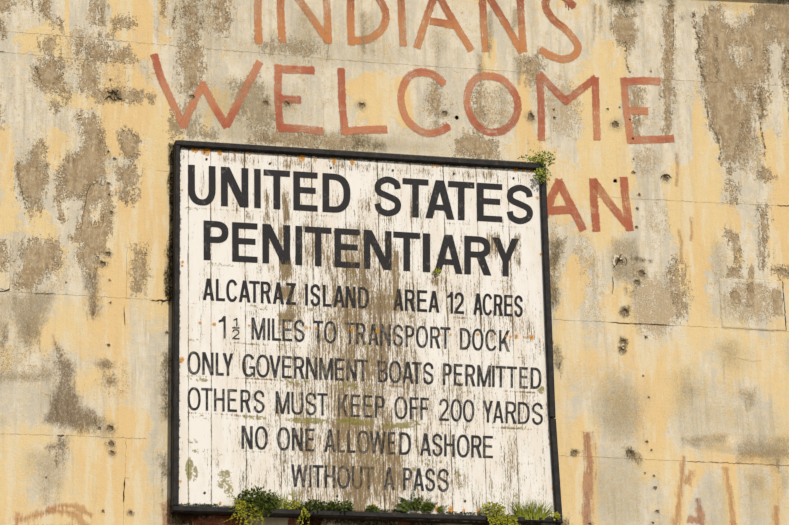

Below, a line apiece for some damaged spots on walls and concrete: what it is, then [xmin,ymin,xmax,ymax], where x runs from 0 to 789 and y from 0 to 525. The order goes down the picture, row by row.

peeling [607,8,640,73]
peeling [0,0,157,297]
spalling [619,304,632,318]
spalling [613,254,650,289]
peeling [663,253,694,324]